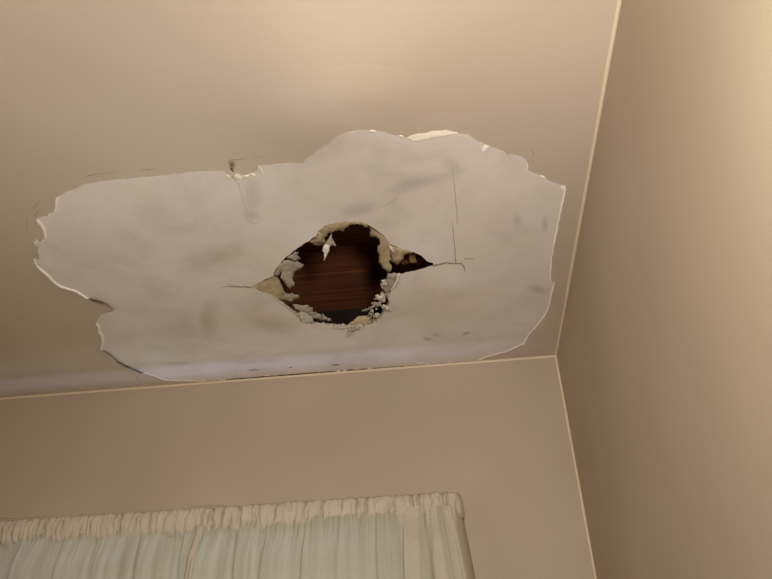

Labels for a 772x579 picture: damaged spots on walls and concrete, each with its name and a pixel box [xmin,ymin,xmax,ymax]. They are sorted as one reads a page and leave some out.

peeling [33,129,566,382]
crack [433,172,475,272]